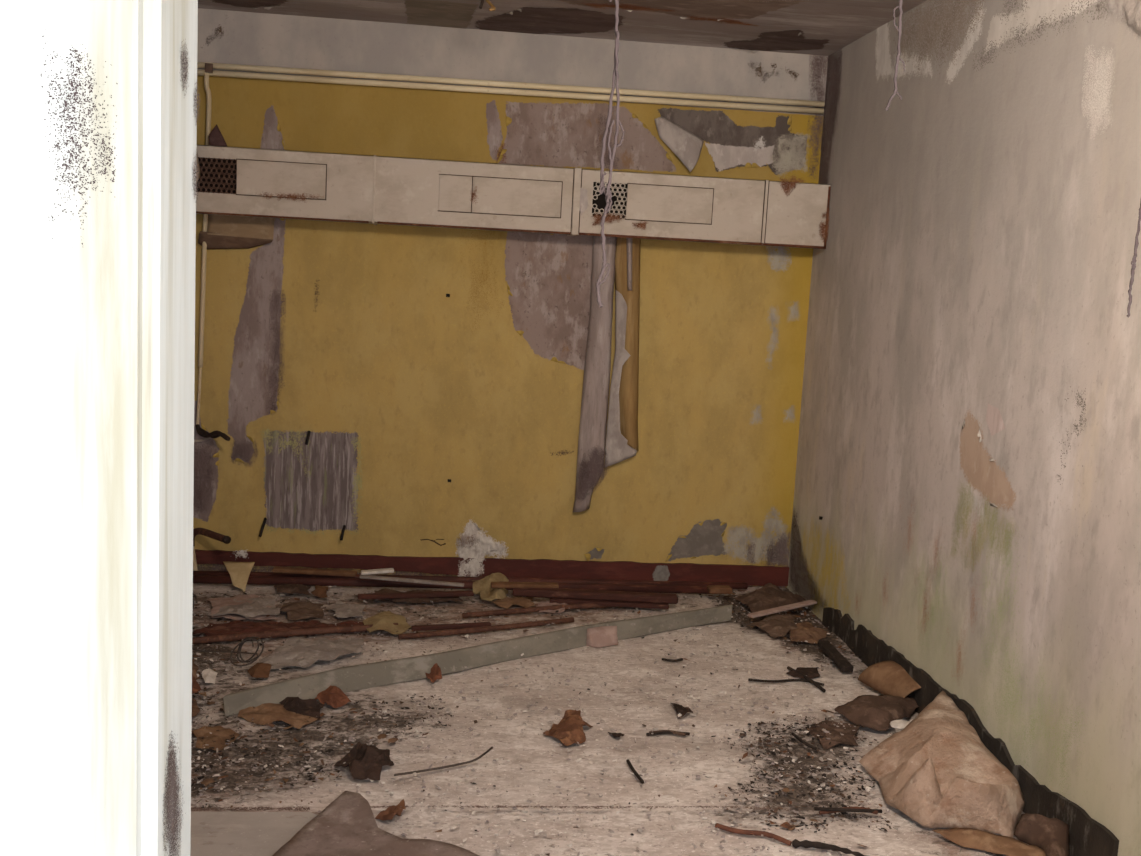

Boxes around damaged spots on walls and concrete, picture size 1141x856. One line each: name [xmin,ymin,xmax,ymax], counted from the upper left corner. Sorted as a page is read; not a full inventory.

corrosion [581,2,761,26]
damp [892,0,985,80]
peeling [196,125,227,181]
peeling [260,105,286,150]
peeling [486,100,810,177]
peeling [193,214,363,537]
peeling [504,231,617,512]
peeling [950,403,1020,575]
flaking render [455,517,509,577]
flaking render [653,519,727,581]